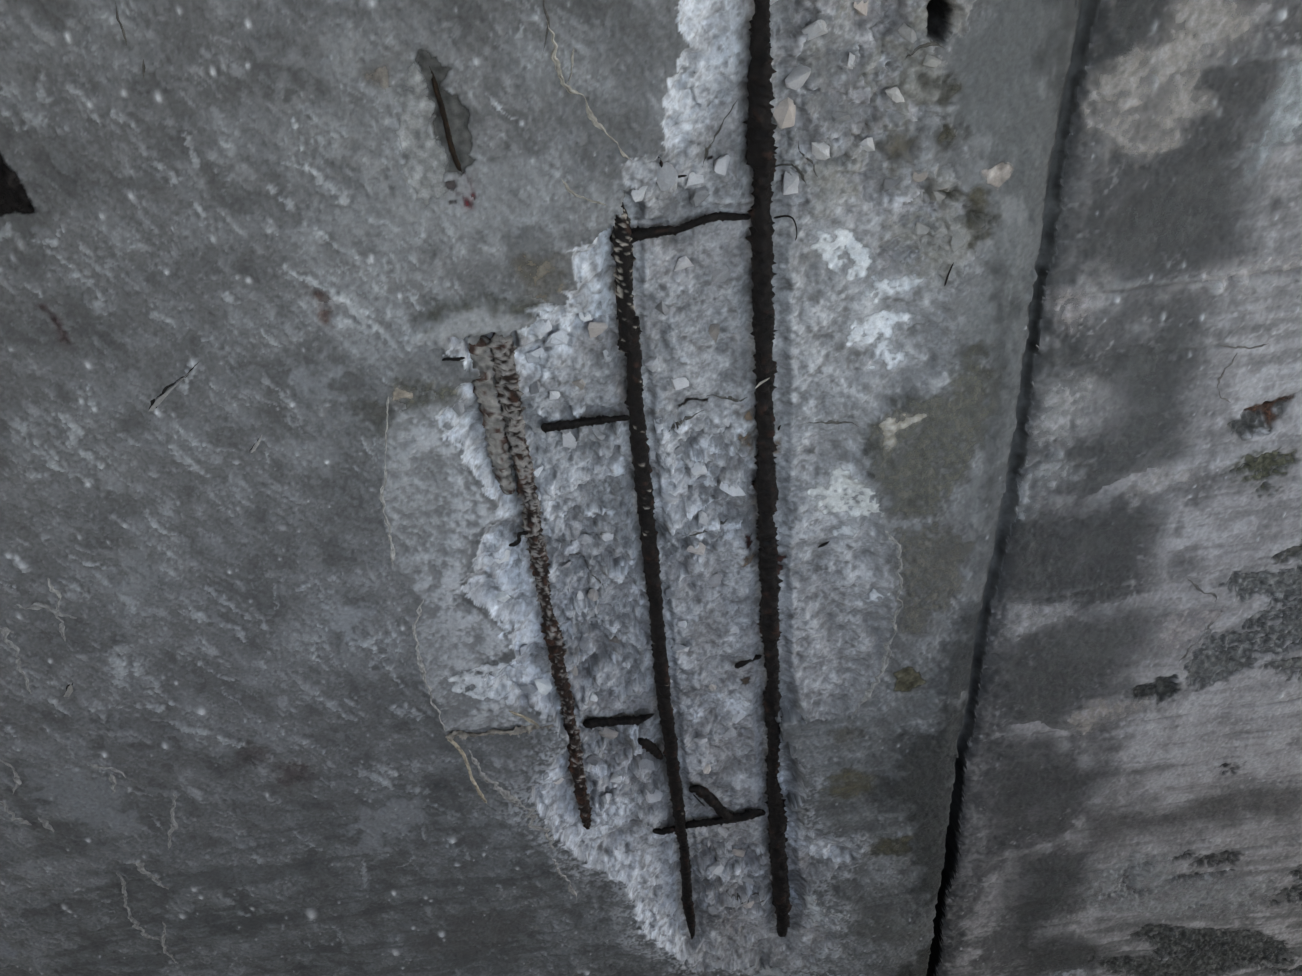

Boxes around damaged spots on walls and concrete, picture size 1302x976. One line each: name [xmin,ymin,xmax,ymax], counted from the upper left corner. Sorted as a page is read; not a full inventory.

crack [906,39,945,58]
damp [1099,0,1163,68]
spalling [394,49,475,206]
damp [1094,113,1270,274]
spalling [435,0,997,974]
rust [743,534,756,567]
damp [1044,328,1195,492]
damp [991,502,1164,835]
damp [1094,789,1302,839]
damp [1006,853,1101,976]